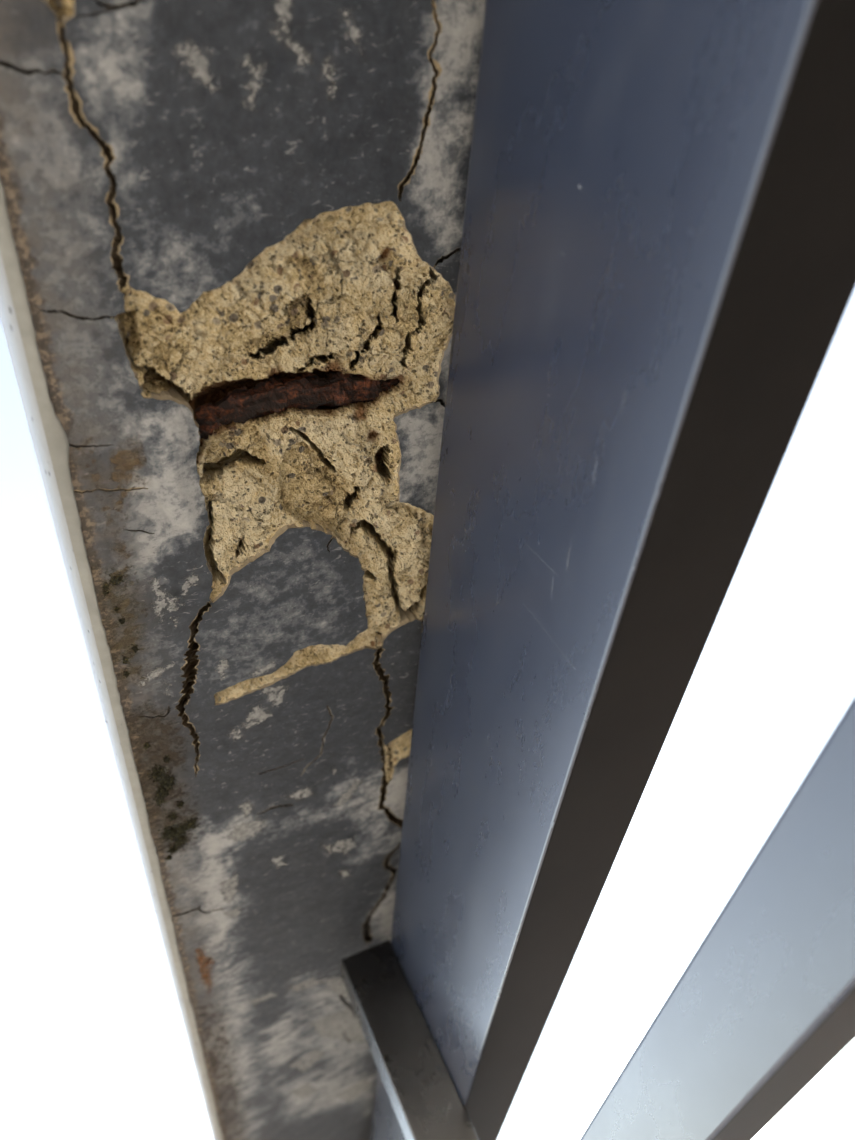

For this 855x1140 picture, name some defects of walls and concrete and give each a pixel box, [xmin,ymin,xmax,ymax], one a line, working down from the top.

spalling [43,0,75,27]
crack [0,0,144,321]
crack [397,0,442,201]
crack [69,441,114,449]
crack [74,486,148,494]
spalling [111,201,456,739]
crack [139,602,212,777]
crack [362,632,403,943]